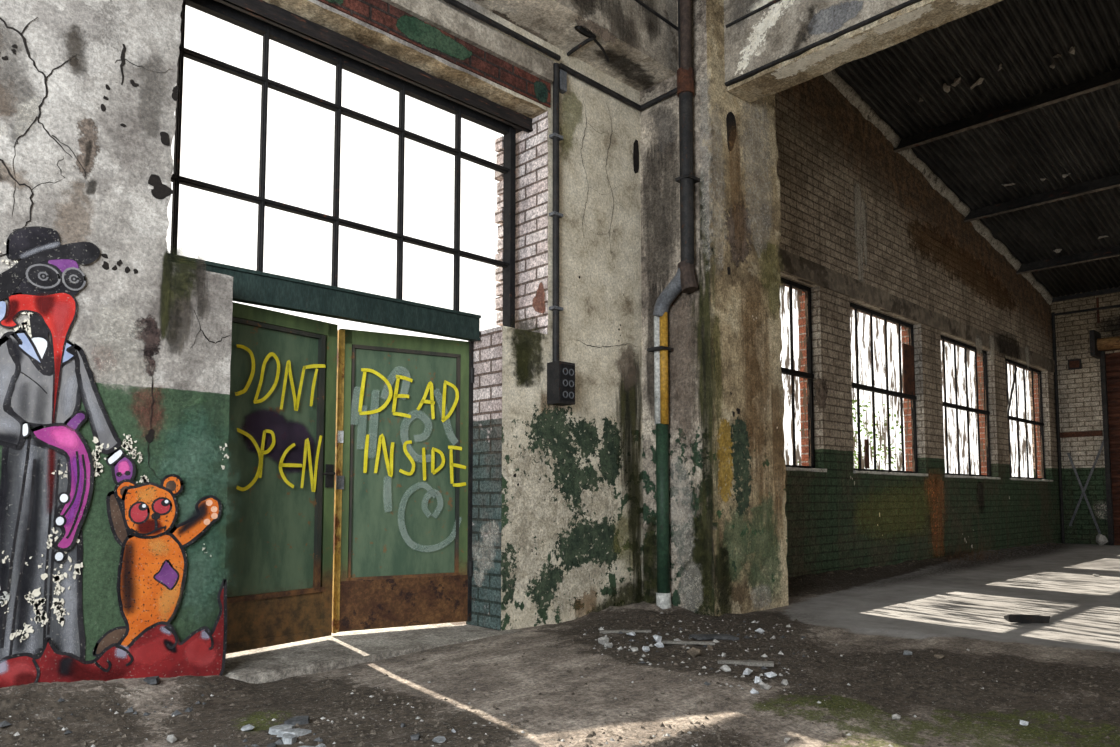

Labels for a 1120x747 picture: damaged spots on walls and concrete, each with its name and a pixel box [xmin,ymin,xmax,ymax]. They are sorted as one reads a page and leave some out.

crack [115,44,168,85]
peeling [735,0,795,75]
peeling [771,4,933,79]
crack [0,17,89,260]
water stain [617,108,678,595]
water stain [668,292,695,439]
spalling [500,402,623,613]